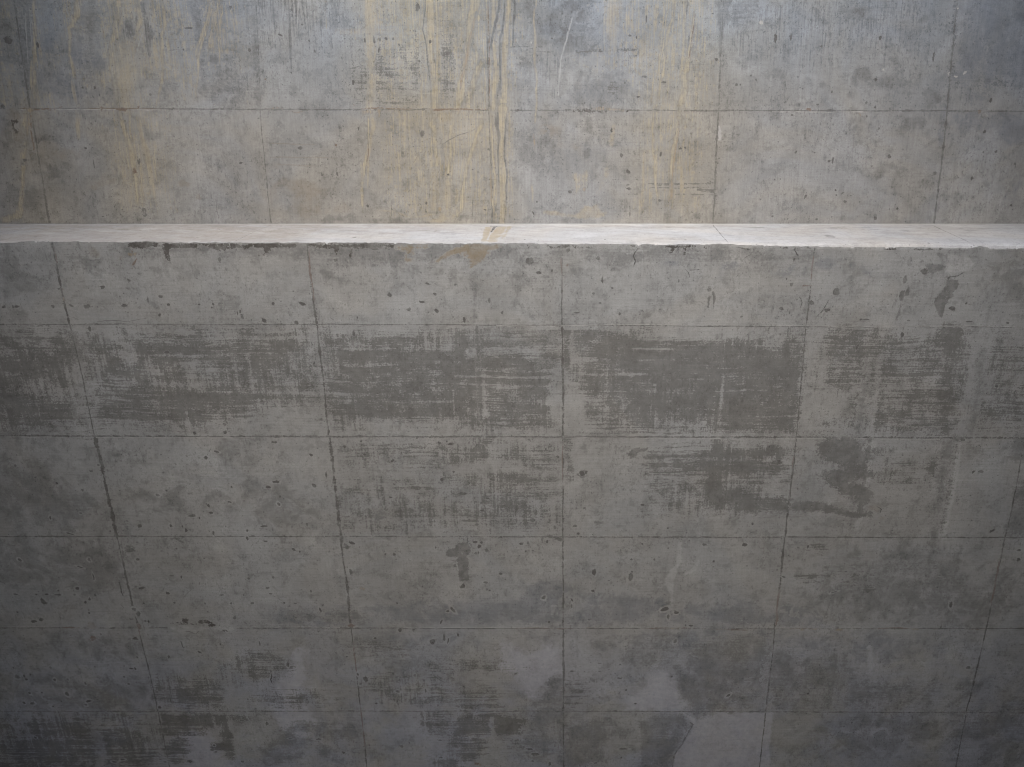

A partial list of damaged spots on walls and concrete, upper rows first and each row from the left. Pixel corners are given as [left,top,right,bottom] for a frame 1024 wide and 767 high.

rust [394,243,502,268]